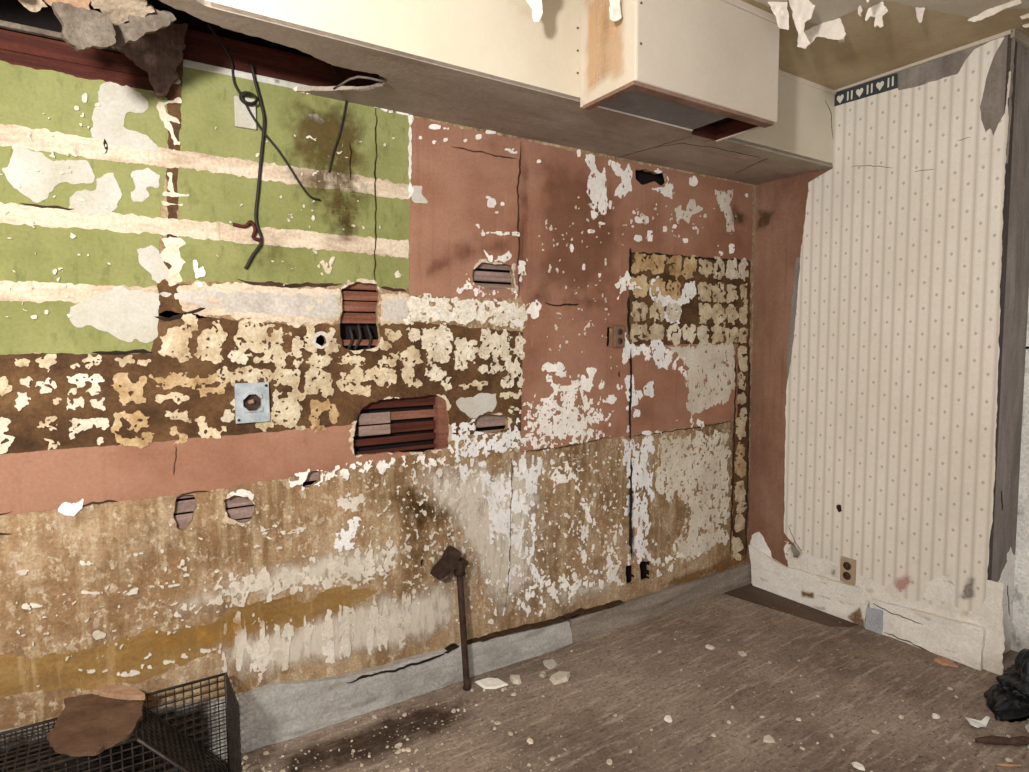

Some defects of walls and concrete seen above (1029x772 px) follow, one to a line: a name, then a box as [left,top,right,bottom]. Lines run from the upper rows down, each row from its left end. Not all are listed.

peeling [526,0,543,22]
peeling [768,0,846,49]
peeling [858,0,888,28]
peeling [915,7,925,23]
leakage [295,111,358,235]
peeling [0,149,748,682]
peeling [750,532,772,558]
leakage [232,587,451,673]
crack [346,600,625,683]
flaking render [784,541,1005,675]